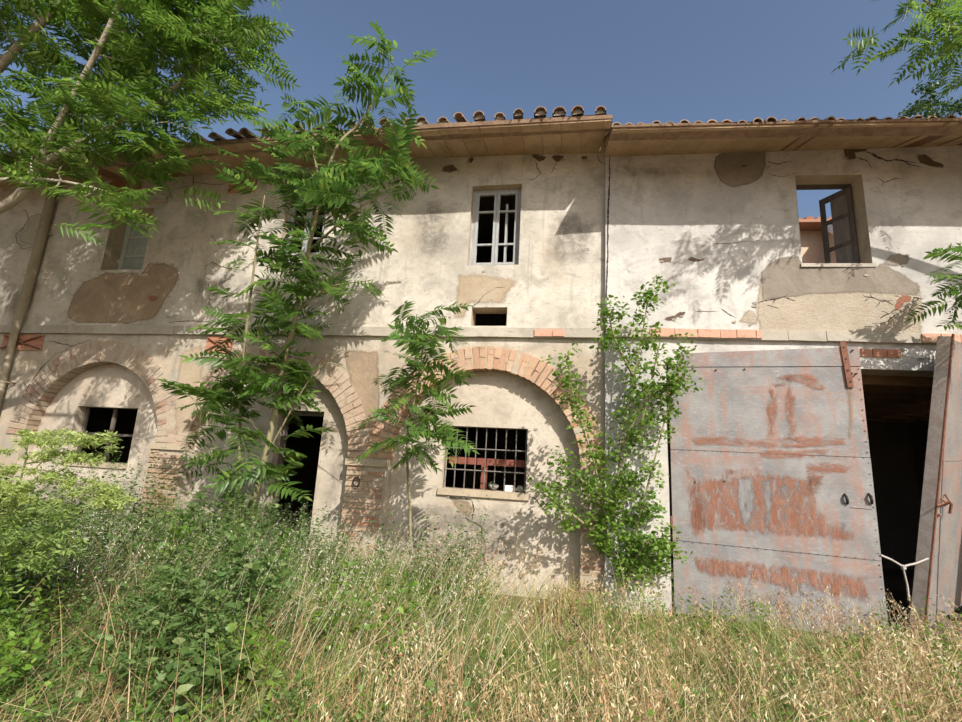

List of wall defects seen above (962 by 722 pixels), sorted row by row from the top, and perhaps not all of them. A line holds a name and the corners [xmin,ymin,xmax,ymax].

crack [857,151,919,185]
flaking render [68,263,180,325]
flaking render [449,270,516,318]
flaking render [650,281,962,343]
crack [863,294,922,327]